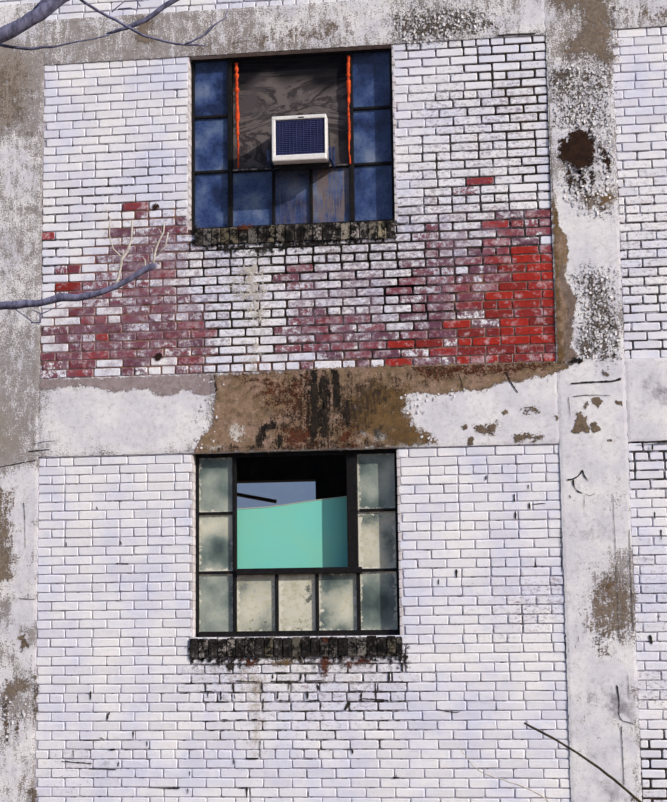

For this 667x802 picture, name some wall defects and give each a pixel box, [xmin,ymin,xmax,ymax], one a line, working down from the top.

peeling [380,0,624,186]
peeling [453,177,493,194]
crack [547,106,555,192]
peeling [38,194,578,454]
leakage [200,369,415,452]
peeling [571,397,603,435]
crack [567,470,593,503]
crack [613,496,653,644]